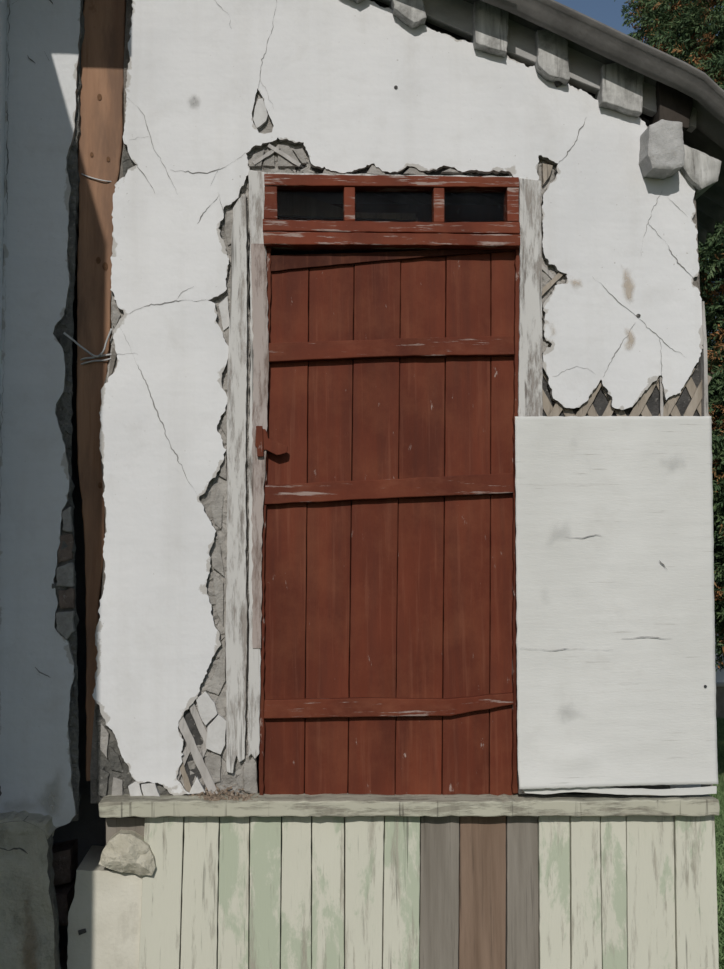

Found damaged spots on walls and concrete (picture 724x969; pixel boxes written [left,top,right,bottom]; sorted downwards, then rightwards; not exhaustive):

crack [125,96,245,224]
flaking render [352,165,509,177]
flaking render [538,158,557,206]
crack [642,192,690,274]
flaking render [106,291,124,383]
crack [131,286,209,313]
flaking render [542,255,565,353]
crack [562,279,685,377]
crack [52,0,83,817]
crack [123,338,196,492]
flaking render [177,92,340,795]
flaking render [542,357,713,424]